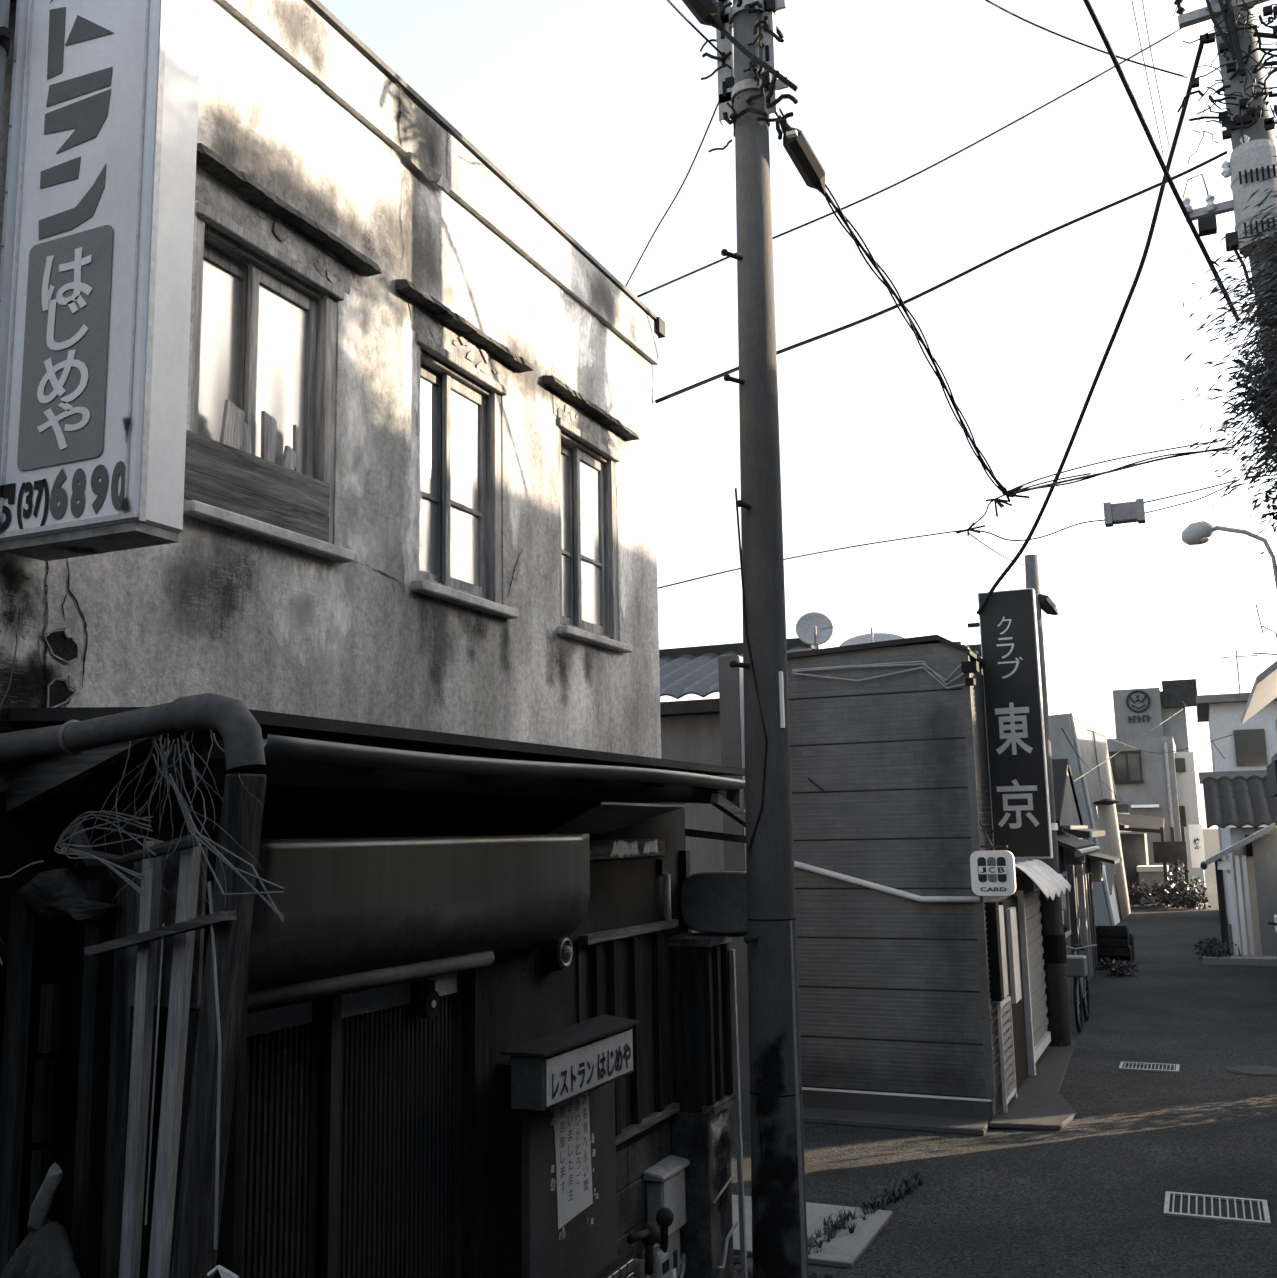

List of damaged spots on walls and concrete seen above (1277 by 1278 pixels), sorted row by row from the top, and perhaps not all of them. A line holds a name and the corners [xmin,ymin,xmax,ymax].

damp [276,0,320,61]
damp [0,561,36,637]
damp [179,548,349,657]
damp [0,646,58,734]